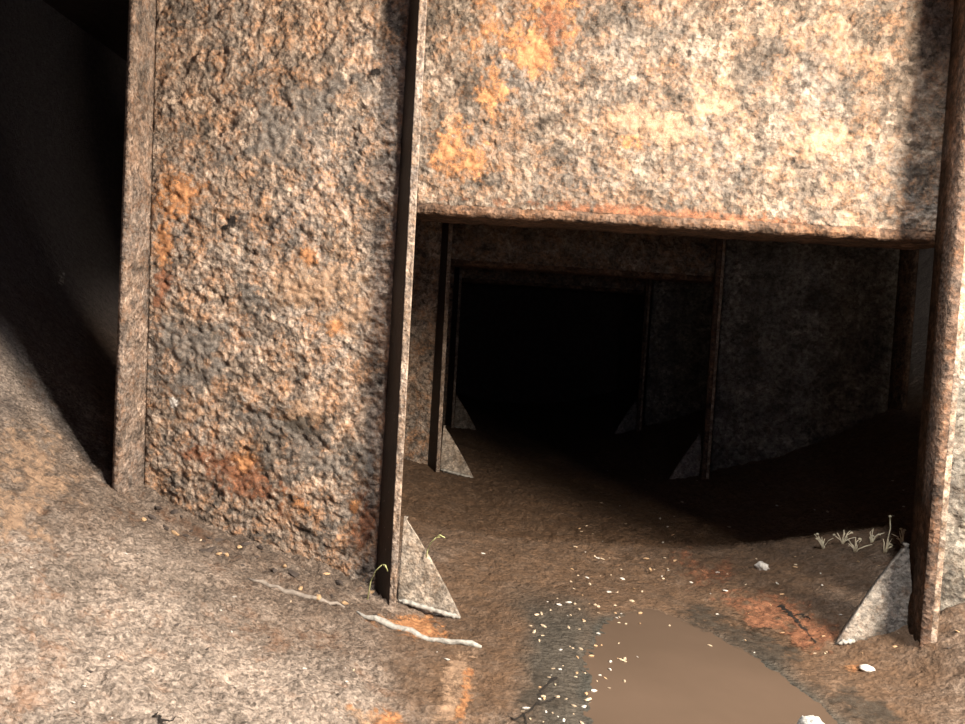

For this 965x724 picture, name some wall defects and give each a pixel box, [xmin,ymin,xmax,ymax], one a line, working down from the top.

corrosion [464,0,589,124]
corrosion [427,98,494,180]
corrosion [153,171,210,307]
corrosion [182,443,312,515]